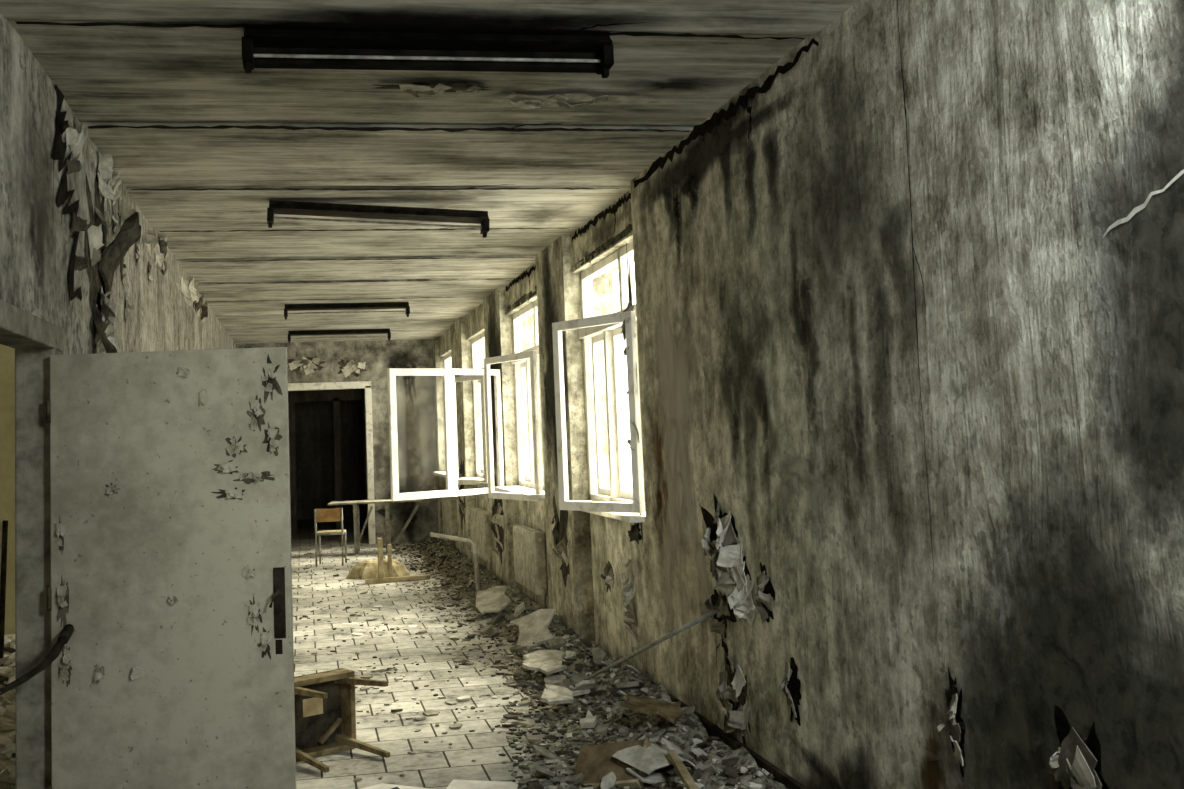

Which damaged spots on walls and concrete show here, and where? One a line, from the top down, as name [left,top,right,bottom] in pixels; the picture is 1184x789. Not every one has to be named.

water stain [627,79,718,92]
spalling [57,112,209,354]
water stain [651,98,778,256]
water stain [1091,0,1184,514]
peeling [211,347,367,500]
water stain [723,326,774,471]
water stain [871,290,890,417]
spalling [700,493,775,626]
spalling [715,652,751,746]
spalling [779,657,801,726]
water stain [802,754,874,789]
water stain [955,505,1184,789]